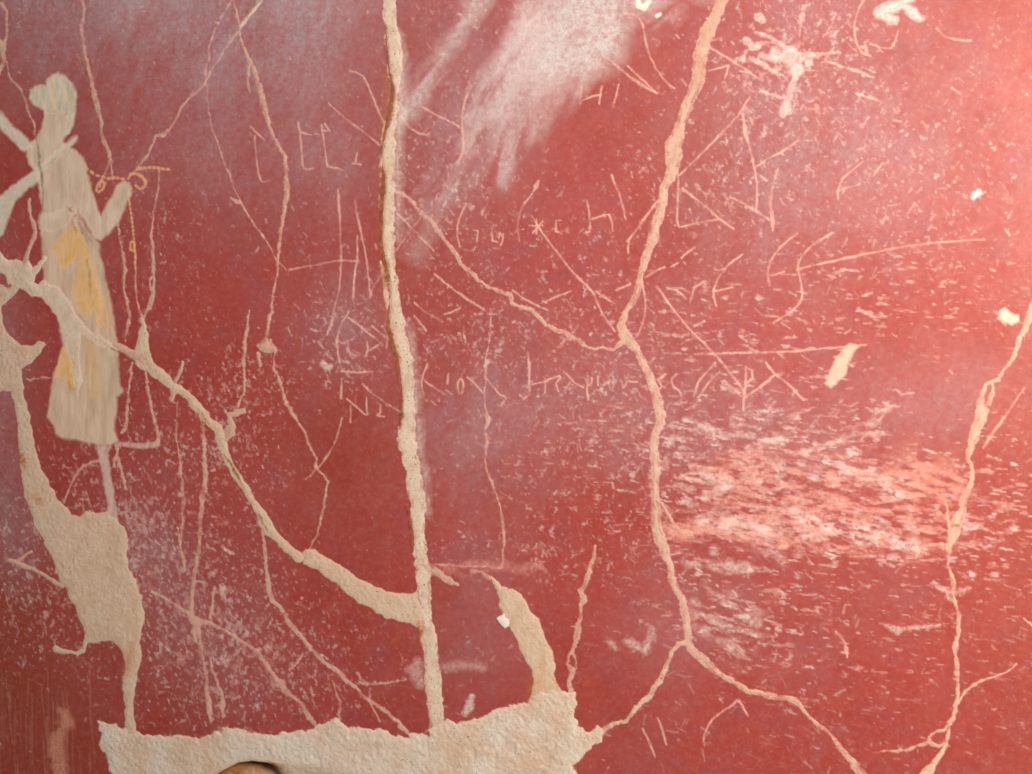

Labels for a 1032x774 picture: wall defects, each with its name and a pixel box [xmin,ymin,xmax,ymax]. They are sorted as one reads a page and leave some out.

crack [0,3,37,140]
crack [80,3,329,520]
crack [113,196,408,734]
flaking render [0,198,603,774]
water stain [538,0,619,77]
crack [379,0,862,774]
crack [883,303,1032,774]